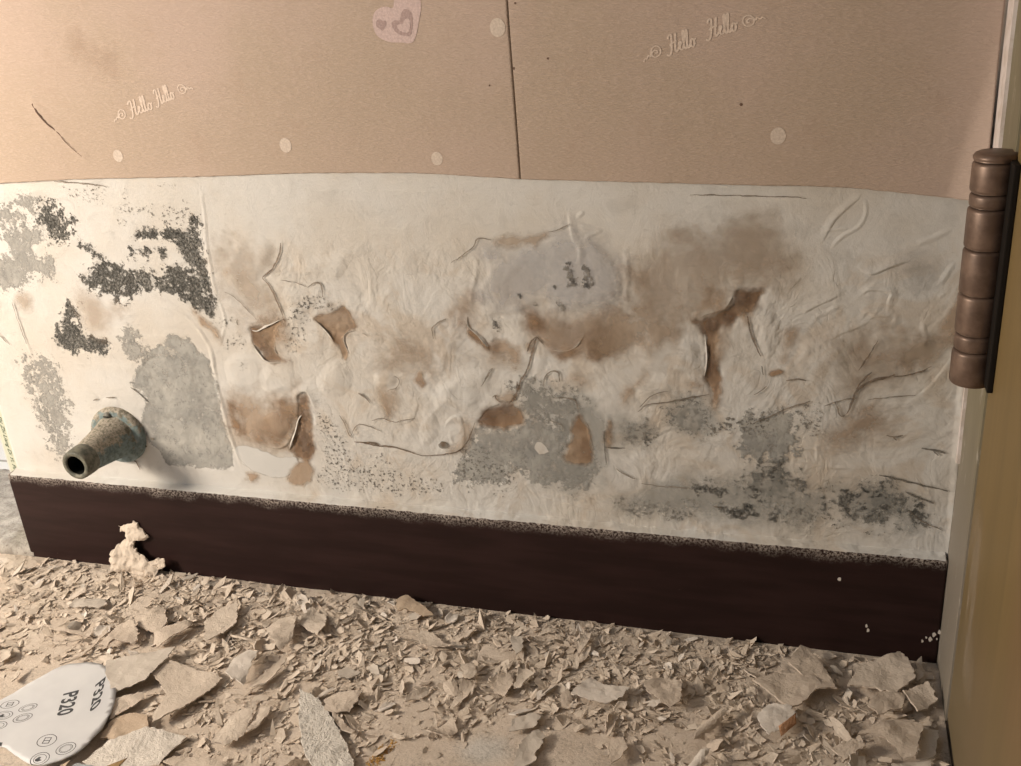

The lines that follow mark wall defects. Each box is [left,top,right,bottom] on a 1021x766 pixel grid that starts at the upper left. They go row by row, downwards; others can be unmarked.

flaking render [0,188,357,364]
leakage [499,234,614,311]
leakage [229,401,300,446]
flaking render [51,298,602,497]
leakage [288,460,312,485]